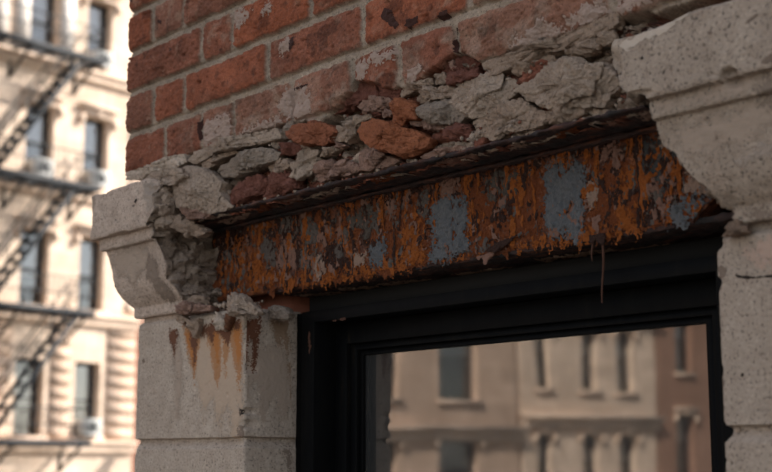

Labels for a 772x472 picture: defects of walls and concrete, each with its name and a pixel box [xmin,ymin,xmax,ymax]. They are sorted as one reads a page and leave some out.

spalling [442,55,485,87]
spalling [278,120,338,157]
spalling [335,82,476,159]
spalling [230,170,308,206]
rust [212,132,704,303]
crack [726,270,772,279]
rust [168,316,292,441]